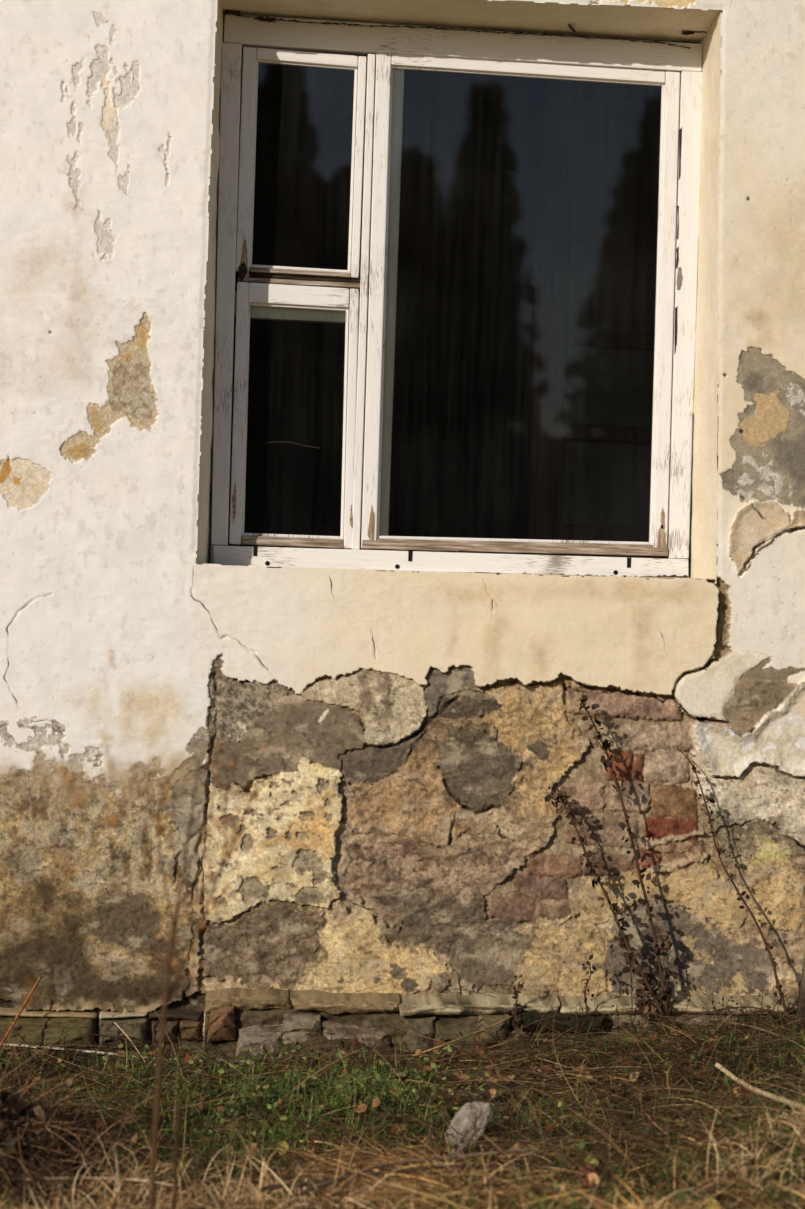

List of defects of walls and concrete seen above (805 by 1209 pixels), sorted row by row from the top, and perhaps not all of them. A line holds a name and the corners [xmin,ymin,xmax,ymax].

peeling [593,0,696,8]
peeling [62,11,142,211]
peeling [95,212,116,262]
peeling [0,459,52,511]
peeling [61,313,159,464]
peeling [720,348,805,509]
crack [3,595,59,723]
crack [191,576,273,676]
spalling [0,649,805,1057]